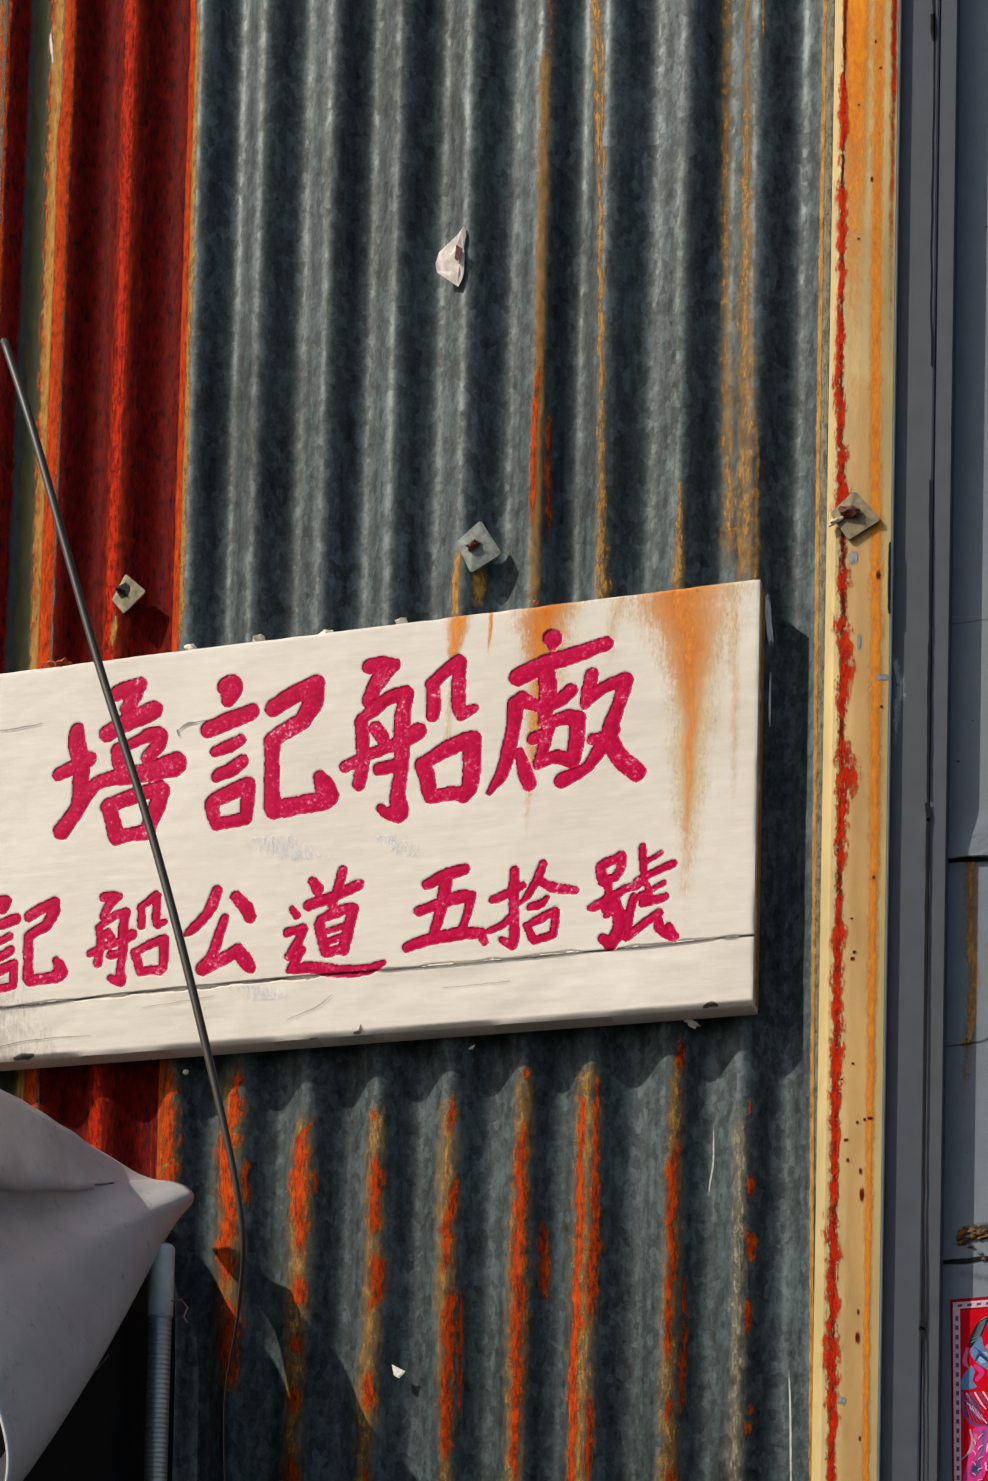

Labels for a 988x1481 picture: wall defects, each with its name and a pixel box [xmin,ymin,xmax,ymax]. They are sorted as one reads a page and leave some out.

corrosion [0,0,200,674]
corrosion [808,0,898,1481]
corrosion [15,1059,182,1181]
corrosion [213,1067,251,1390]
corrosion [284,1121,318,1481]
corrosion [356,1111,388,1481]
corrosion [435,1097,464,1481]
corrosion [506,1067,551,1481]
corrosion [565,1072,606,1481]
corrosion [659,1035,690,1481]
corrosion [729,1101,757,1481]
spalling [956,1224,988,1261]